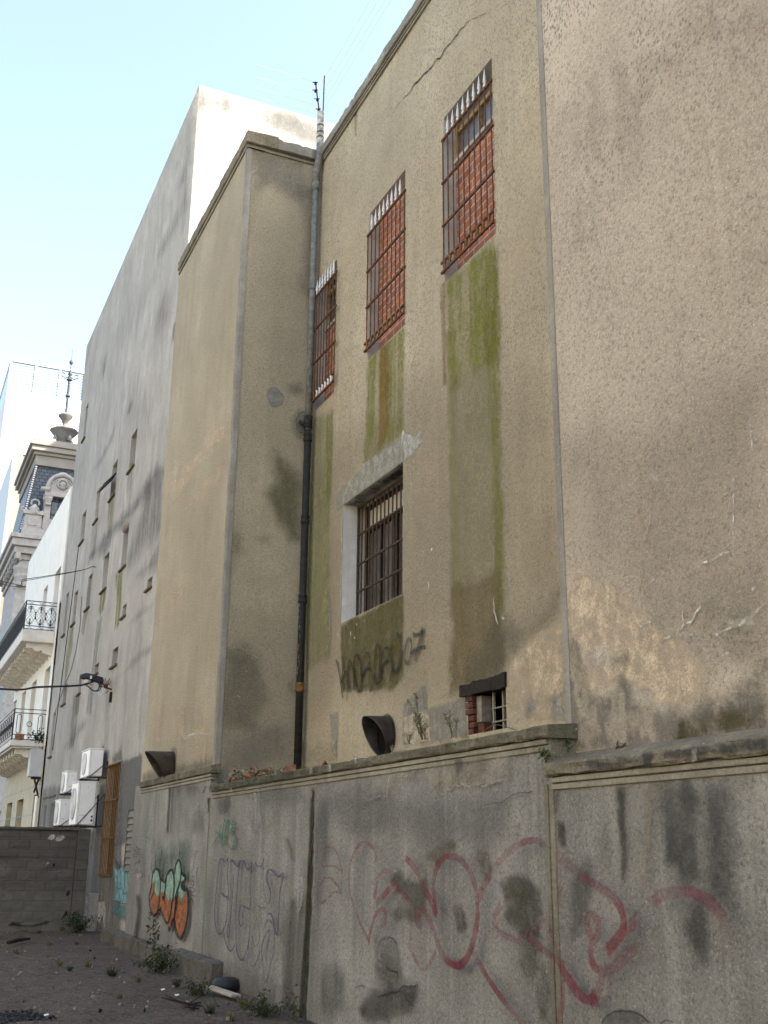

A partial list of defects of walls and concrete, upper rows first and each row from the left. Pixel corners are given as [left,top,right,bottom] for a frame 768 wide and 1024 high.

crack [400,13,485,102]
water stain [616,788,625,872]
water stain [667,783,696,875]